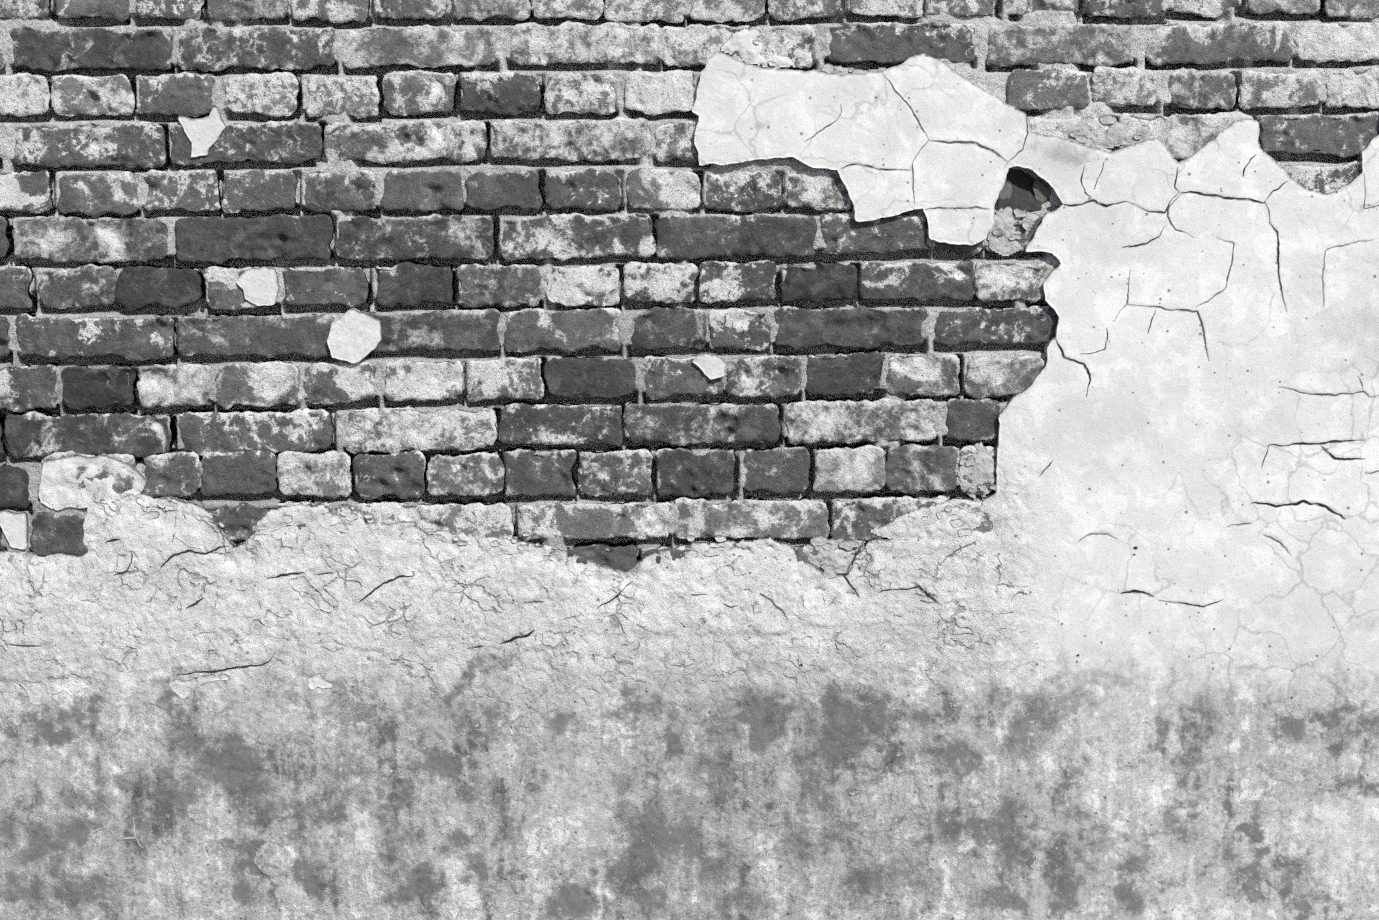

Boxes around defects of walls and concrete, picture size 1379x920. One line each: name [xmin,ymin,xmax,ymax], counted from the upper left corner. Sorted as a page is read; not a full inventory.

crack [843,74,1029,210]
spalling [987,169,1058,256]
crack [1055,154,1288,397]
peeling [111,493,228,552]
spalling [253,503,558,555]
spalling [676,441,997,578]
crack [1232,500,1345,555]
crack [1262,440,1379,473]
damp [0,667,278,916]
damp [547,802,744,920]
damp [926,798,1037,910]
damp [1223,801,1329,920]